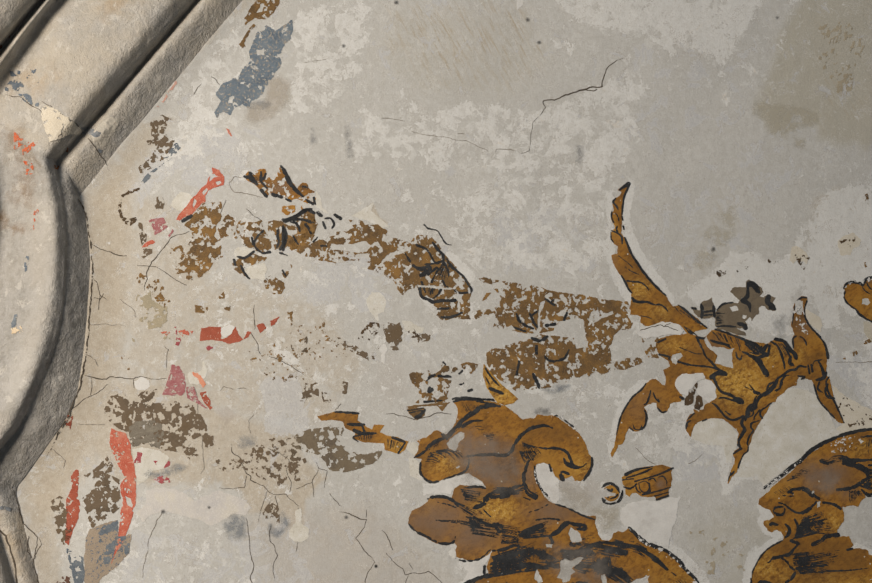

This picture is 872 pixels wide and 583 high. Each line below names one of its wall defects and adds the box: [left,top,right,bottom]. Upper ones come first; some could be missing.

peeling [239,0,280,48]
crack [386,58,623,154]
peeling [118,188,152,258]
crack [91,231,189,290]
crack [71,347,169,425]
peeling [249,311,431,402]
crack [0,490,42,583]
peeling [51,496,76,558]
peeling [82,457,121,528]
peeling [104,387,214,468]
peeling [216,426,382,486]
crack [222,447,442,583]